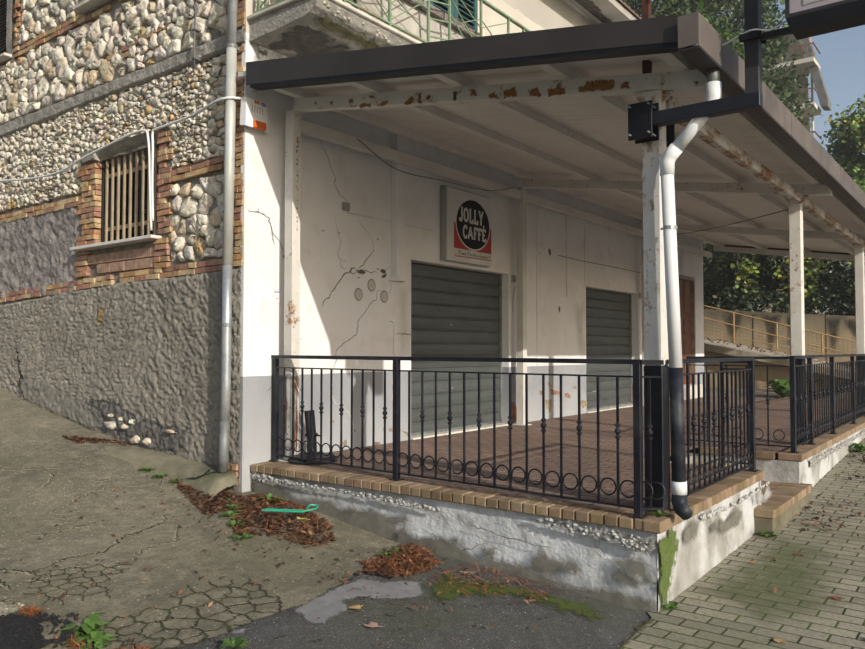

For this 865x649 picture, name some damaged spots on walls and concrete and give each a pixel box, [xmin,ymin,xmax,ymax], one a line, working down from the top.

rust [489,87,517,99]
rust [528,88,565,97]
rust [578,79,630,92]
crack [248,209,284,252]
crack [322,221,375,306]
crack [332,299,377,433]
flaking render [87,399,186,451]
crack [0,463,283,649]
flaking render [533,517,657,553]